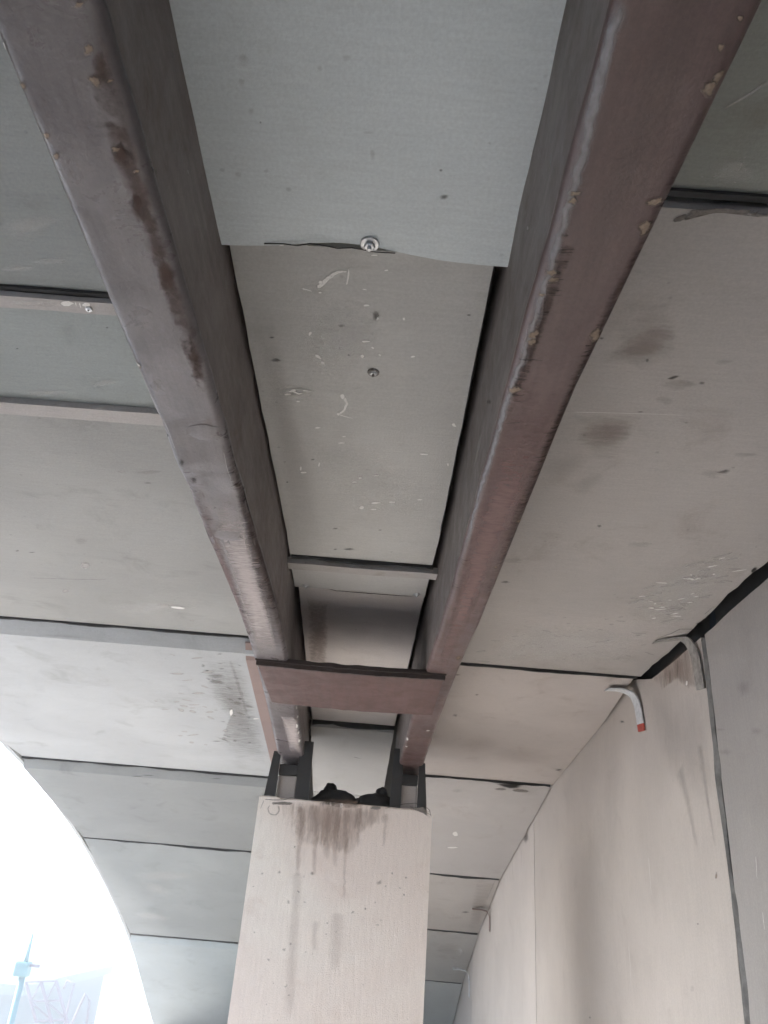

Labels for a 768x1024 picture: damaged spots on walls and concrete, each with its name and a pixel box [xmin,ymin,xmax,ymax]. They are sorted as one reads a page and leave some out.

corrosion [111,132,184,325]